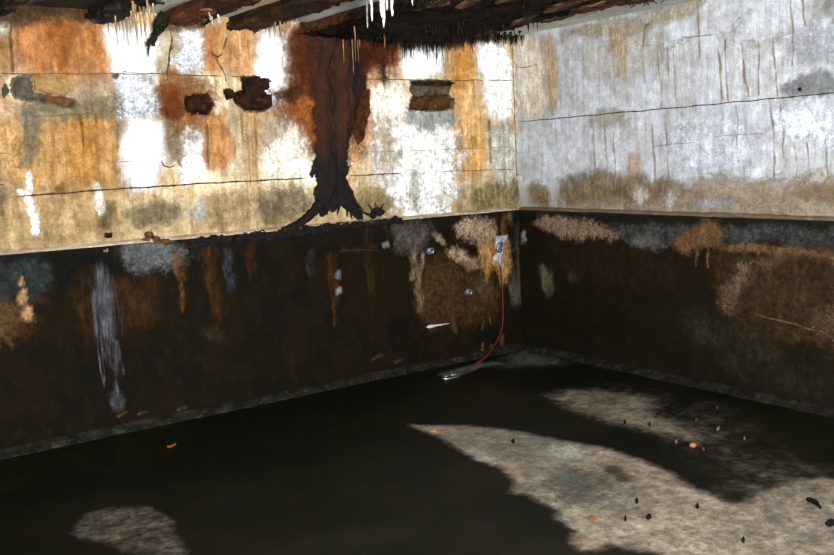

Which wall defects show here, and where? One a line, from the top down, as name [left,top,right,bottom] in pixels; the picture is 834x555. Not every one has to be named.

corrosion [0,15,111,81]
leakage [0,25,315,248]
spalling [184,93,214,116]
spalling [223,75,274,114]
corrosion [269,22,402,233]
crack [349,170,401,178]
leakage [357,81,477,253]
spalling [407,79,455,112]
corrosion [446,41,488,179]
crack [444,164,518,190]
crack [366,46,834,152]
leakage [559,72,834,260]